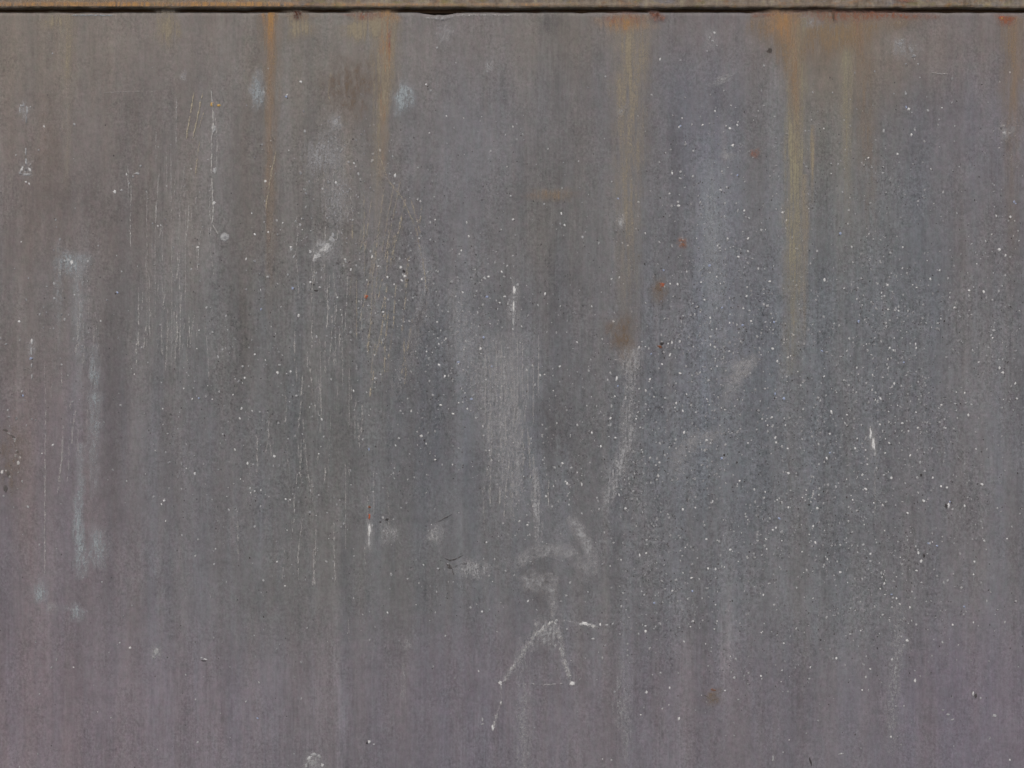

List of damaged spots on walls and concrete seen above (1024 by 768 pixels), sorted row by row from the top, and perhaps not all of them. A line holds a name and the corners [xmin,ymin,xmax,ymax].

rust [0,1,312,85]
rust [329,3,398,149]
rust [607,3,664,231]
rust [728,3,916,312]